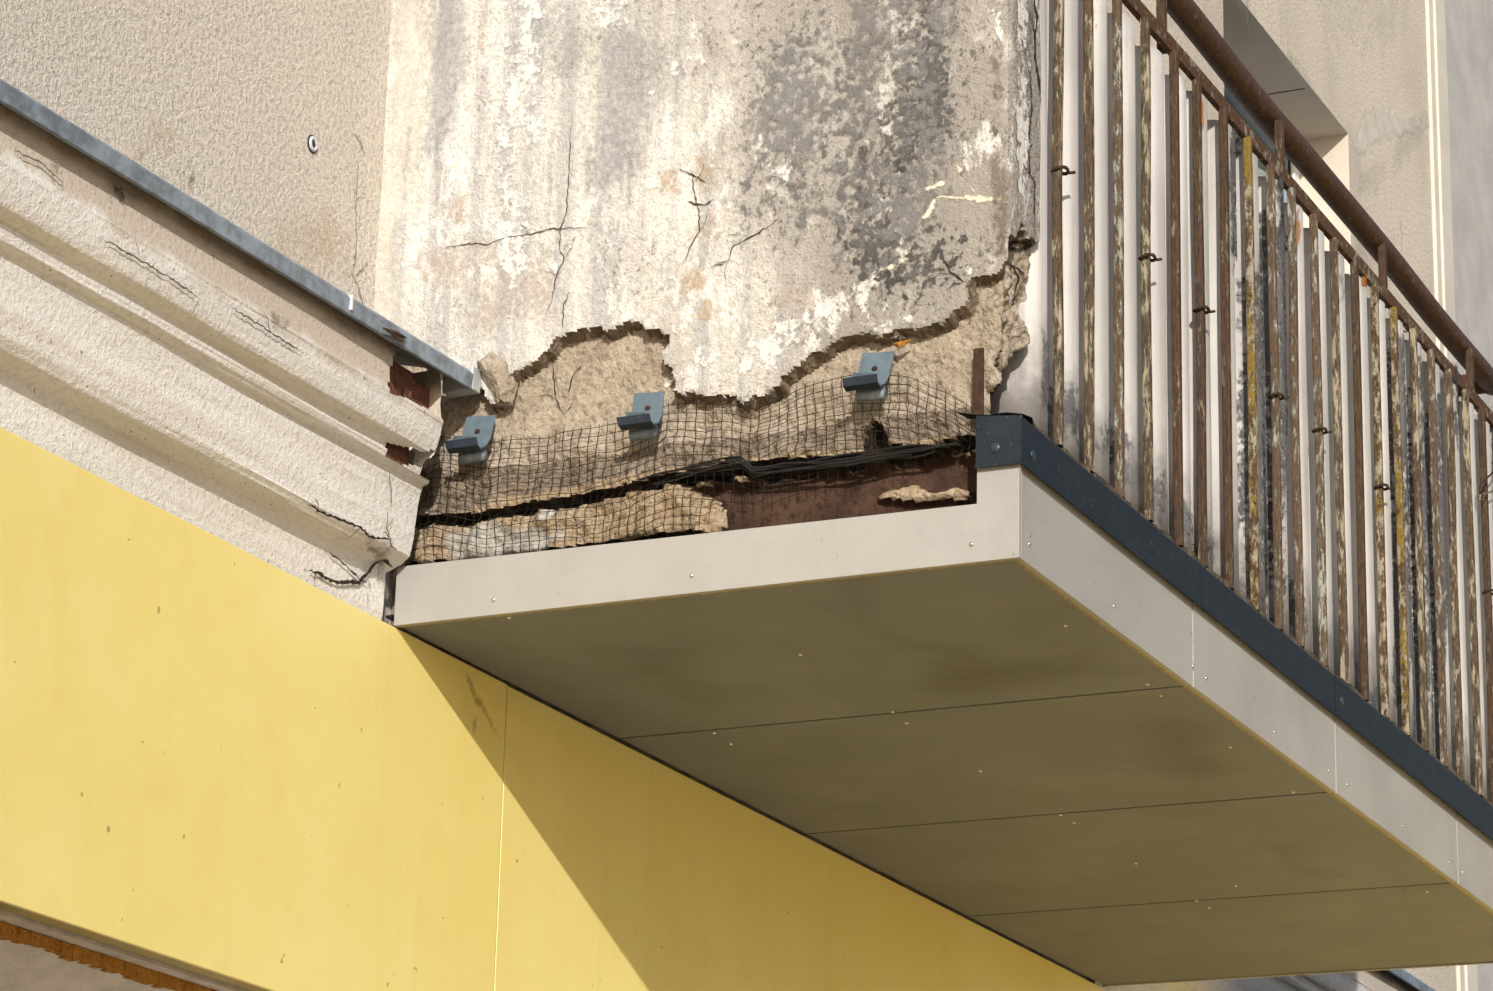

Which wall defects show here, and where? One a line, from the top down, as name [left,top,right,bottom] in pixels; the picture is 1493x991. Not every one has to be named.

peeling [418,0,559,331]
crack [446,115,582,412]
peeling [588,0,629,31]
peeling [640,0,705,194]
crack [680,165,780,277]
peeling [770,164,793,183]
damp [741,0,988,310]
peeling [992,0,1031,204]
damp [1019,0,1035,120]
spalling [385,223,1039,515]
crack [306,472,397,585]
peeling [447,509,566,560]